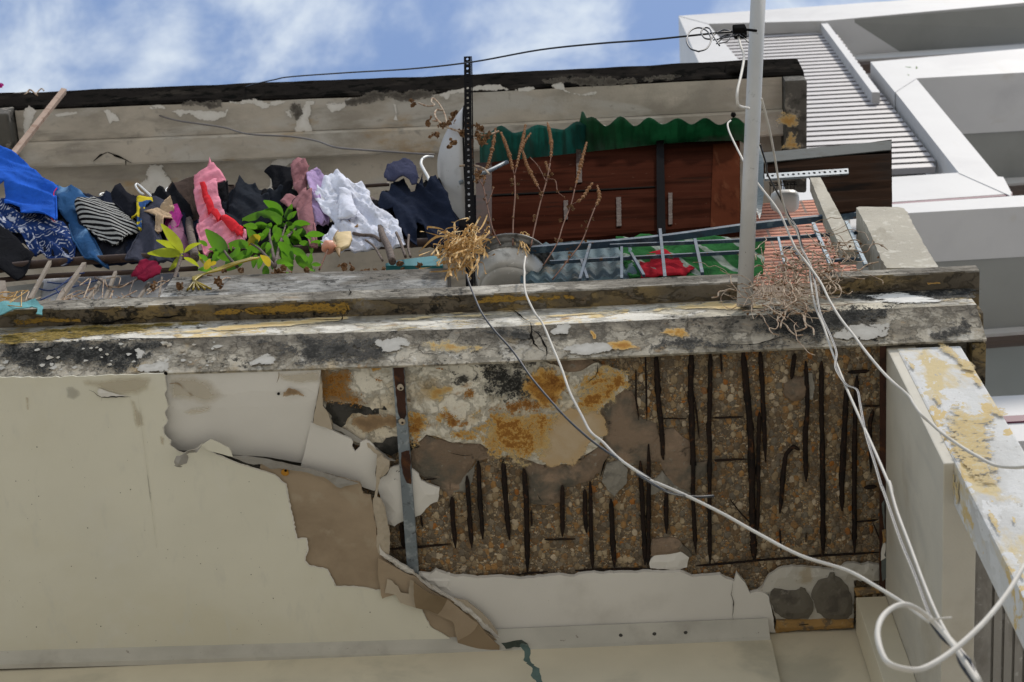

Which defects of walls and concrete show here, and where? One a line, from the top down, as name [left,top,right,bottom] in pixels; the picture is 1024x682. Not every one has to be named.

damp [481,329,530,339]
crack [512,309,548,356]
damp [650,288,976,352]
peeling [135,348,169,372]
damp [0,316,389,409]
peeling [249,354,276,365]
mould [445,362,536,403]
peeling [938,343,982,386]
corrosion [351,365,630,484]
peeling [933,395,1007,505]
spalling [313,322,890,637]